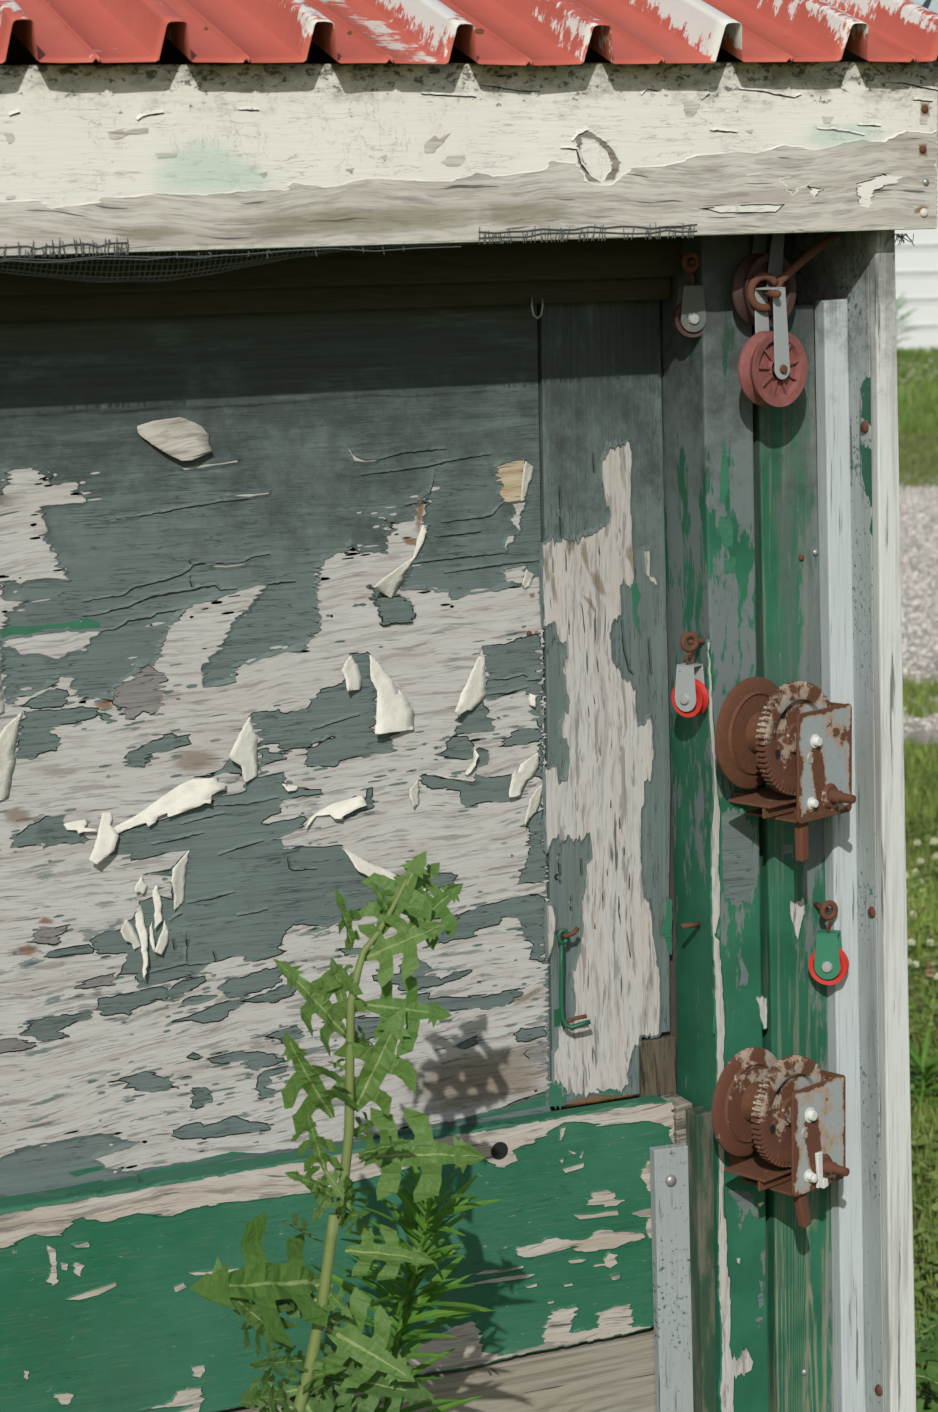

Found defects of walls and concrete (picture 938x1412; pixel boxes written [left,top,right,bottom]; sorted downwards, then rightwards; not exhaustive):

peeling [0,100,938,254]
crack [560,127,590,174]
peeling [137,417,241,473]
peeling [0,438,675,1301]
peeling [705,639,726,1085]
peeling [755,995,768,1030]
peeling [389,1282,652,1376]
peeling [717,1141,754,1412]